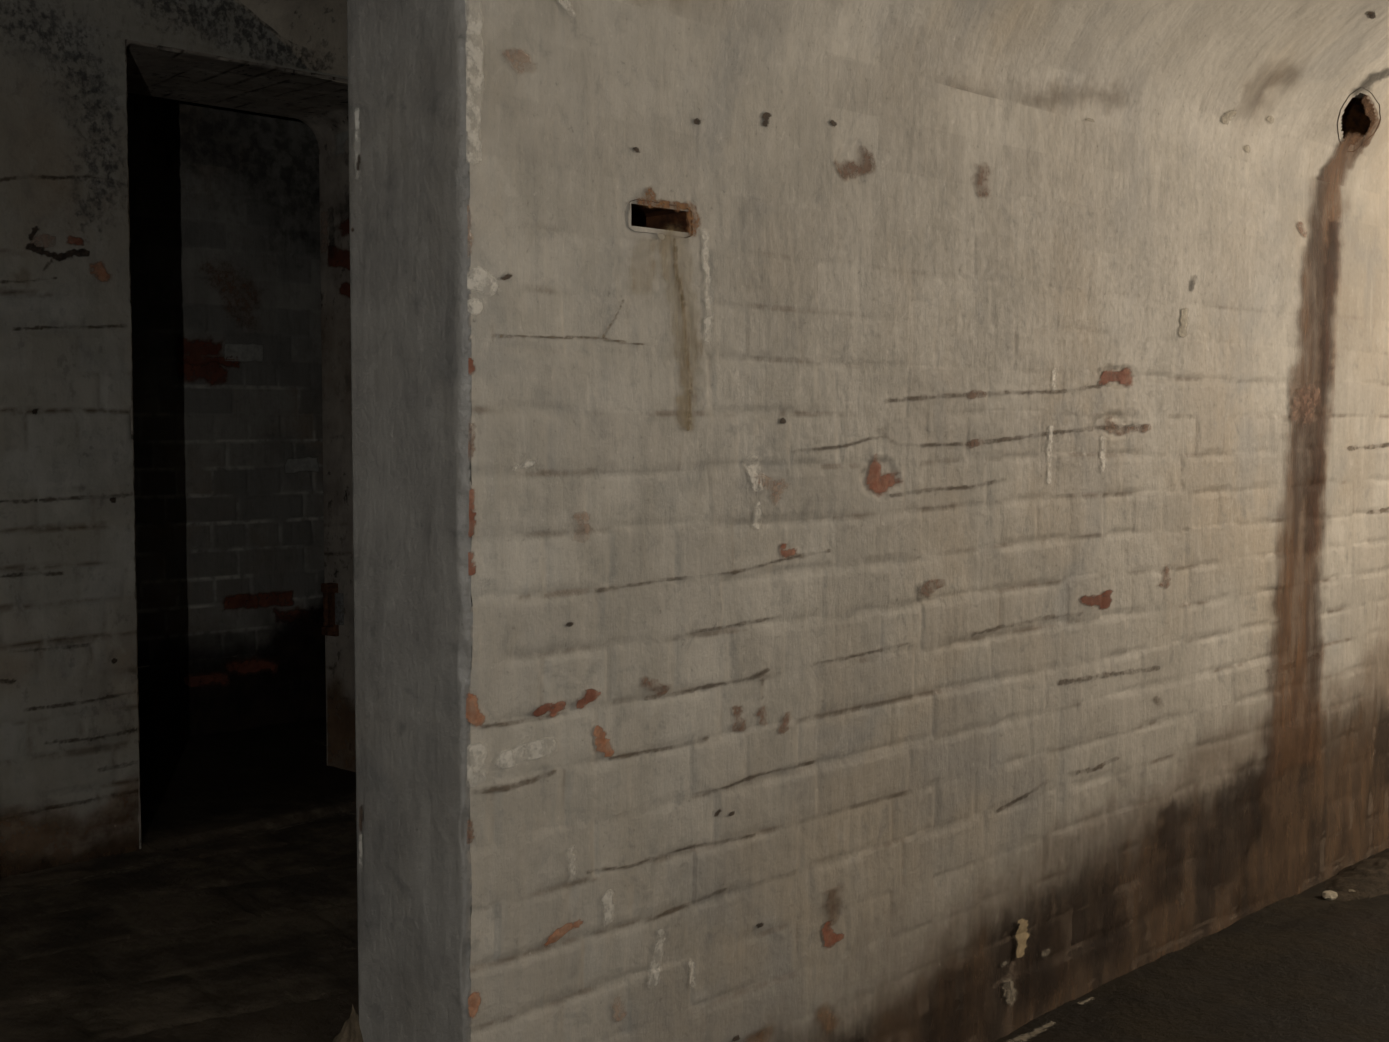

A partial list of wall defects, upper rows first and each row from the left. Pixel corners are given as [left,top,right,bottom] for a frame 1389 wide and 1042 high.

mould [142,0,323,71]
flaking render [328,219,350,298]
flaking render [1099,368,1132,385]
flaking render [867,455,901,495]
rust [1239,134,1364,918]
flaking render [224,591,294,610]
water stain [138,603,356,769]
flaking render [466,693,485,726]
flaking render [533,689,601,717]
flaking render [593,726,614,757]
water stain [1302,707,1389,892]
water stain [818,755,1282,1042]